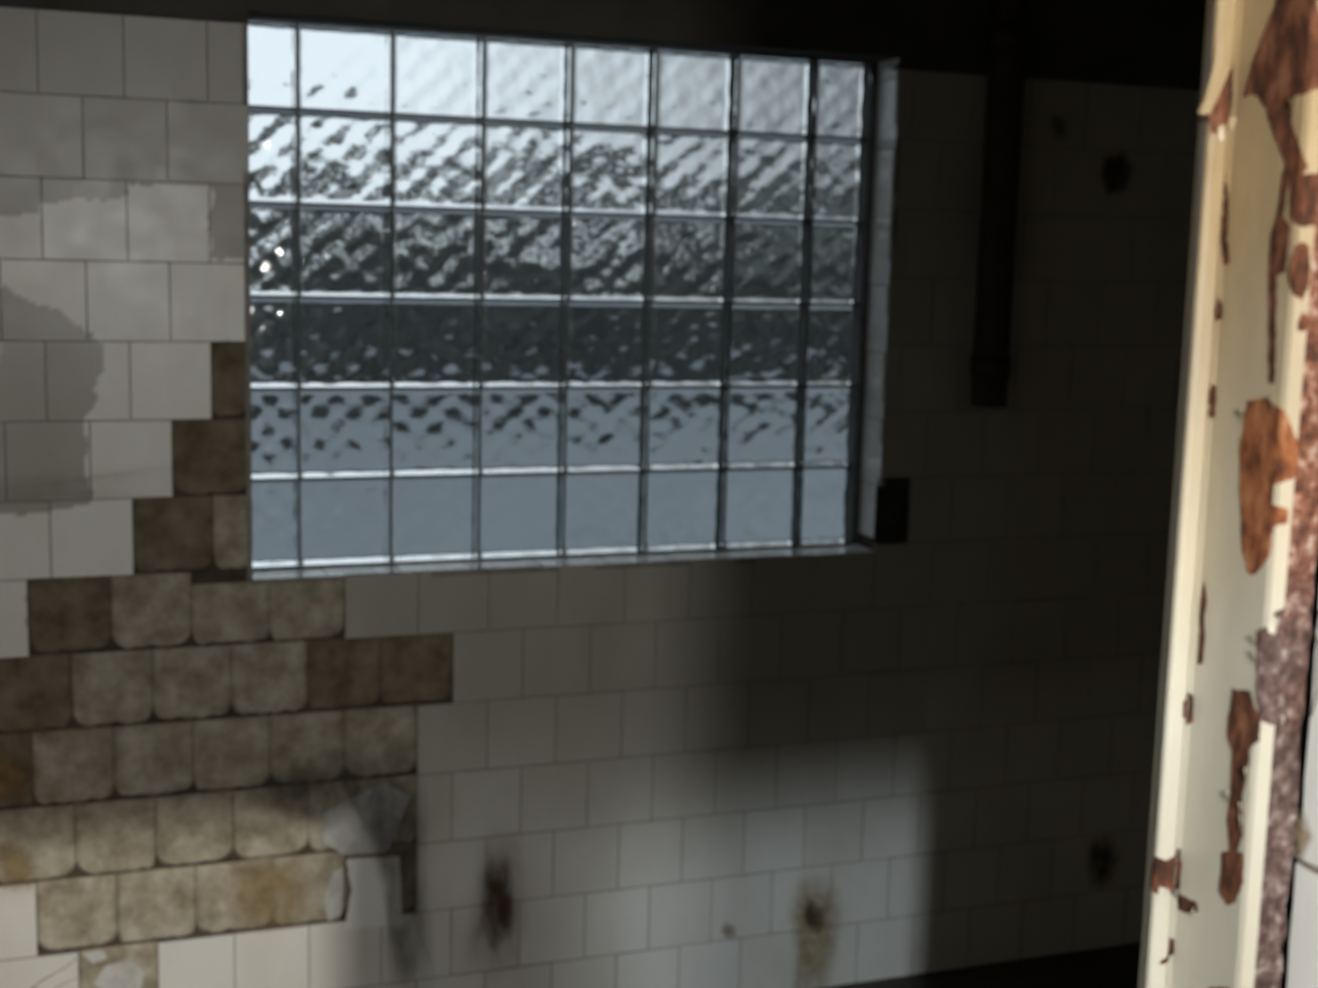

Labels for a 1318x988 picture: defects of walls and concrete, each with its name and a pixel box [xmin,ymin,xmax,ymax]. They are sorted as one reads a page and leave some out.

peeling [1198,43,1236,140]
spalling [0,342,453,988]
crack [1310,629,1318,716]
rust [1219,606,1285,906]
rust [1295,817,1310,855]
crack [1294,847,1318,874]